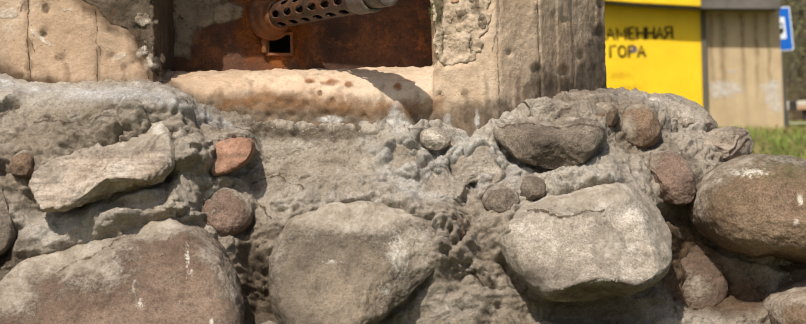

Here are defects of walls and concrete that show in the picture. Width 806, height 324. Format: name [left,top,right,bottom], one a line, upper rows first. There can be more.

spalling [83,0,164,76]
spalling [424,0,492,67]
leakage [524,27,607,99]
crack [35,114,102,124]